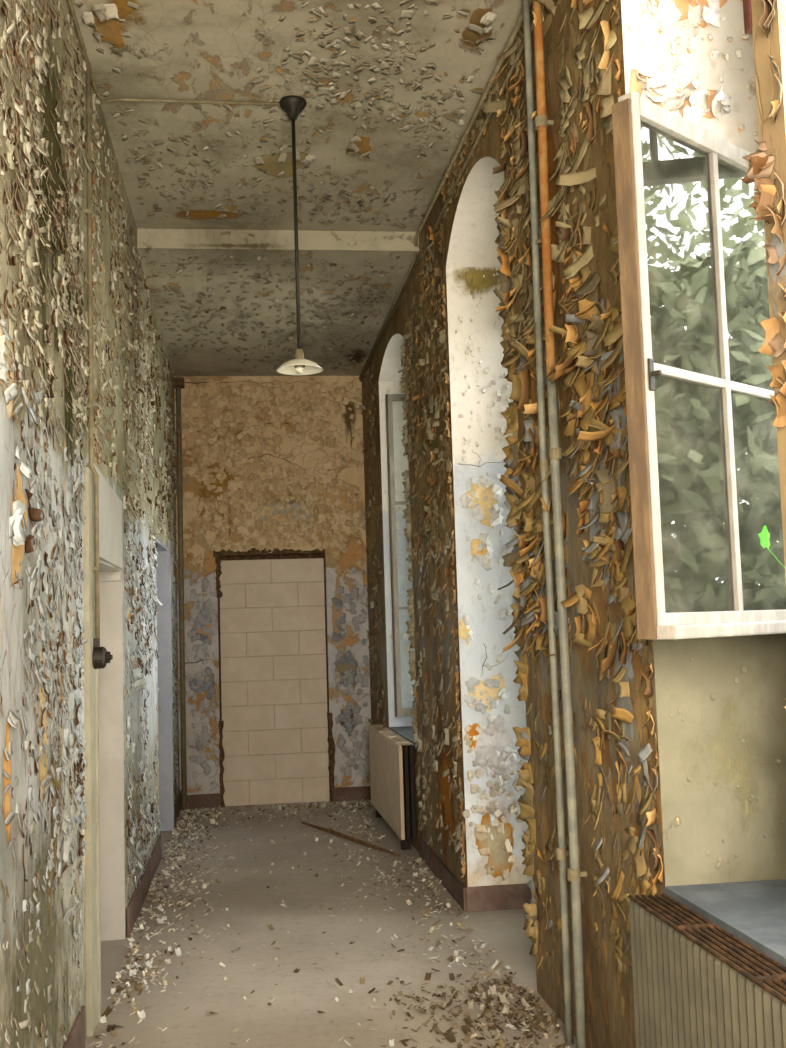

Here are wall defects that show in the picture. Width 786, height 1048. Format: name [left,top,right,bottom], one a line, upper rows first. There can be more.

peeling [758,0,786,38]
peeling [768,55,783,124]
rust [547,126,558,200]
rust [550,211,558,245]
peeling [736,123,786,299]
peeling [758,312,786,427]
peeling [0,0,427,1048]
peeling [280,0,753,987]